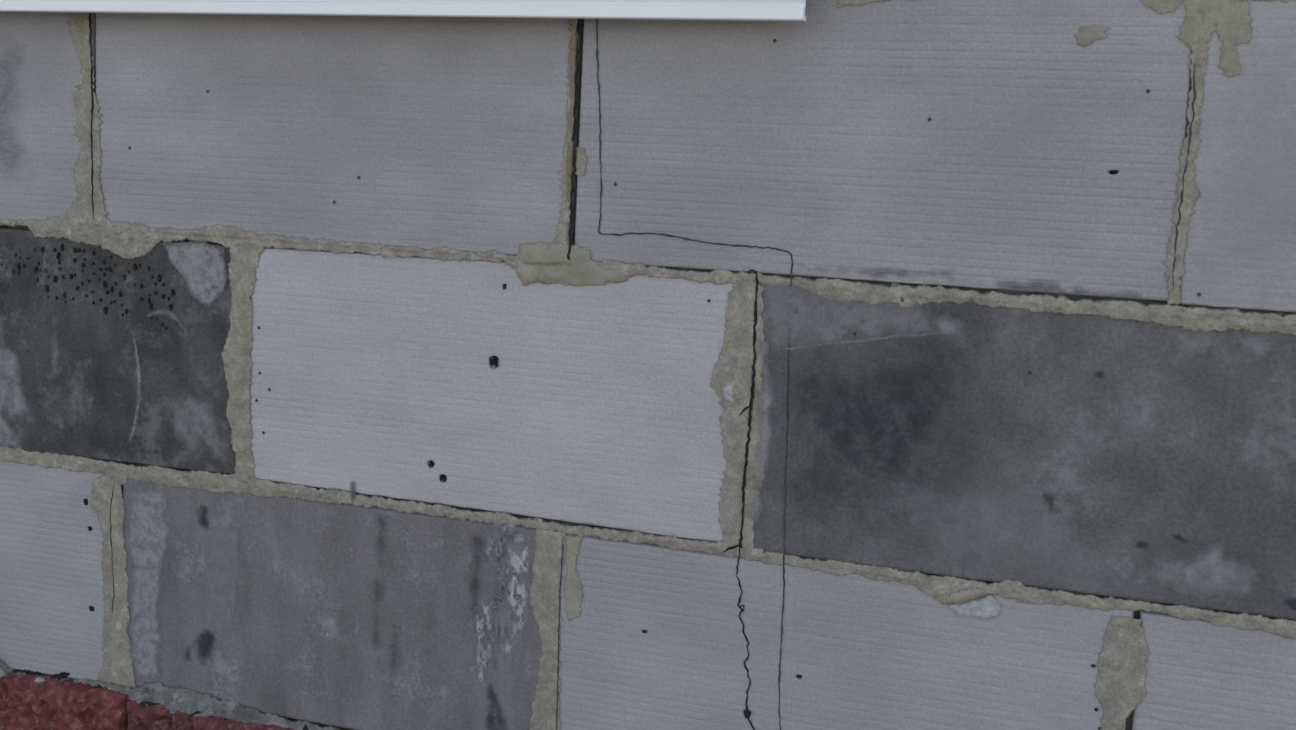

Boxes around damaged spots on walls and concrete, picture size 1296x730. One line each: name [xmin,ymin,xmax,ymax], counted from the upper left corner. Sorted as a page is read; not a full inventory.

crack [87,13,95,211]
crack [1172,59,1197,289]
crack [596,19,793,730]
damp [488,532,528,730]